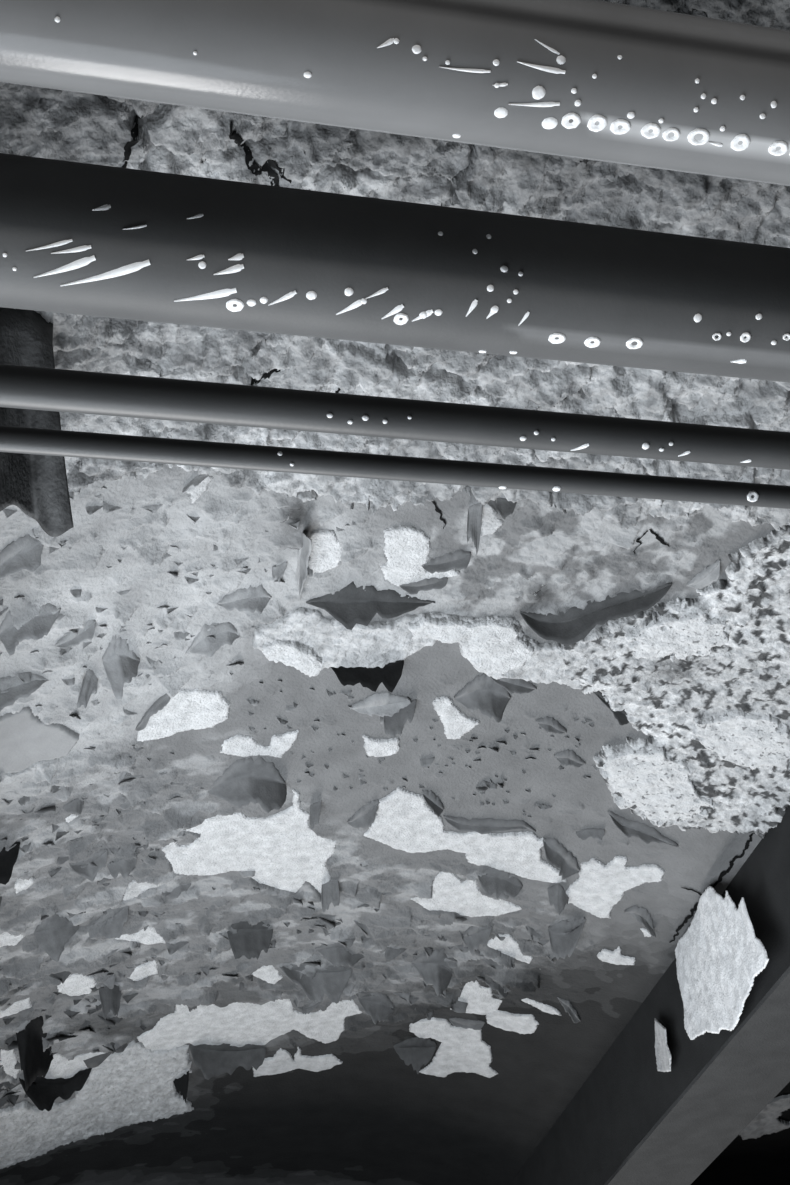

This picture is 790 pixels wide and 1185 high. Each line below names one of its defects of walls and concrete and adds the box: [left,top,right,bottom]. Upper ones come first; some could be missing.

spalling [602,0,790,31]
spalling [0,82,790,248]
spalling [0,307,790,432]
spalling [0,407,790,486]
flaking render [0,452,790,1169]